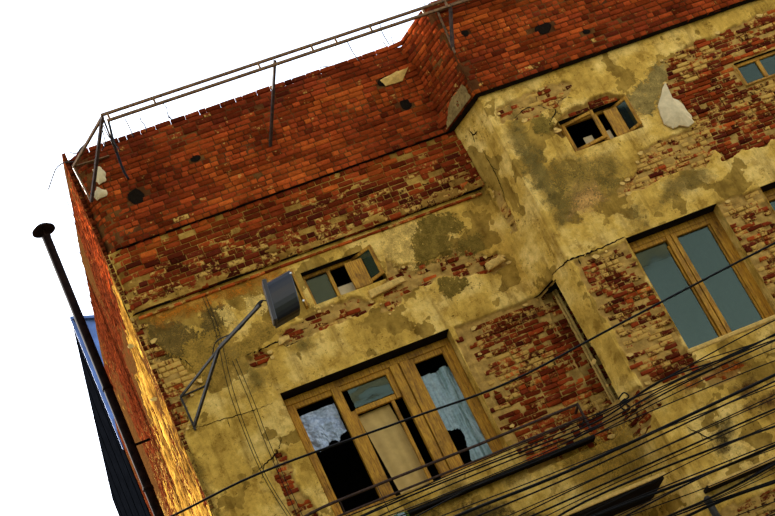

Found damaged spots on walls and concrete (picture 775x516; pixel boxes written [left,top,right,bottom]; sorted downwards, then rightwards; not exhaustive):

spalling [568,96,617,117]
spalling [618,9,775,198]
water stain [510,113,622,225]
water stain [660,169,706,204]
crack [552,237,624,275]
spalling [456,292,618,462]
spalling [582,249,699,437]
spalling [273,452,318,516]